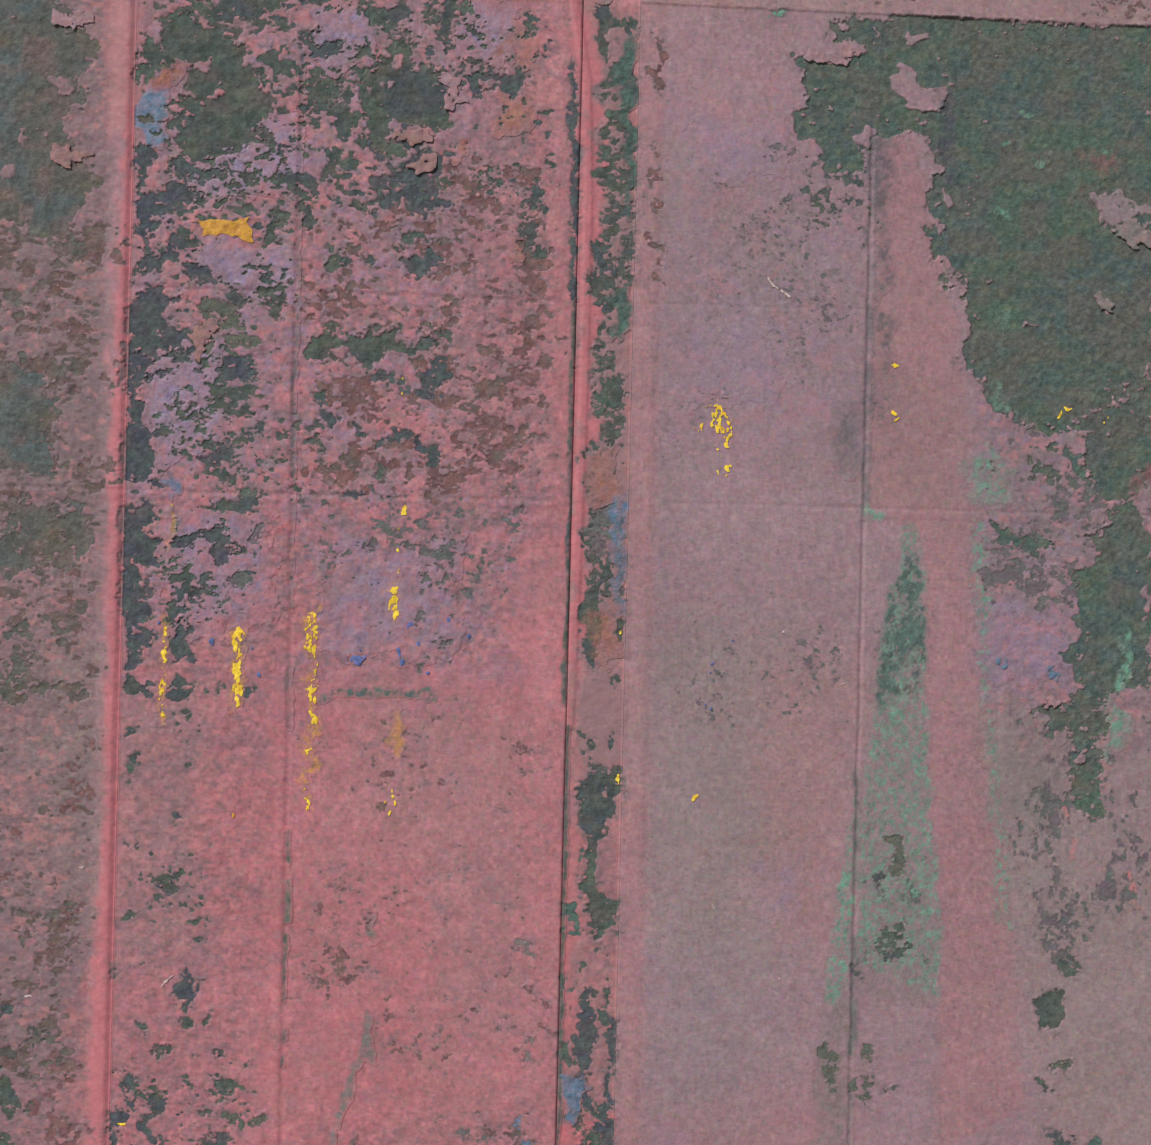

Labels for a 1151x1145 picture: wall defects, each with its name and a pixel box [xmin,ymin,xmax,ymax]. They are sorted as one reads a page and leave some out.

peeling [0,0,669,743]
peeling [712,0,1151,1036]
peeling [365,731,427,811]
peeling [566,731,622,963]
peeling [0,725,104,1145]
peeling [135,1021,175,1061]
peeling [122,854,209,943]
peeling [170,967,211,1029]
peeling [302,946,379,999]
peeling [109,1049,267,1145]
peeling [456,1111,537,1145]
peeling [1044,1130,1102,1145]